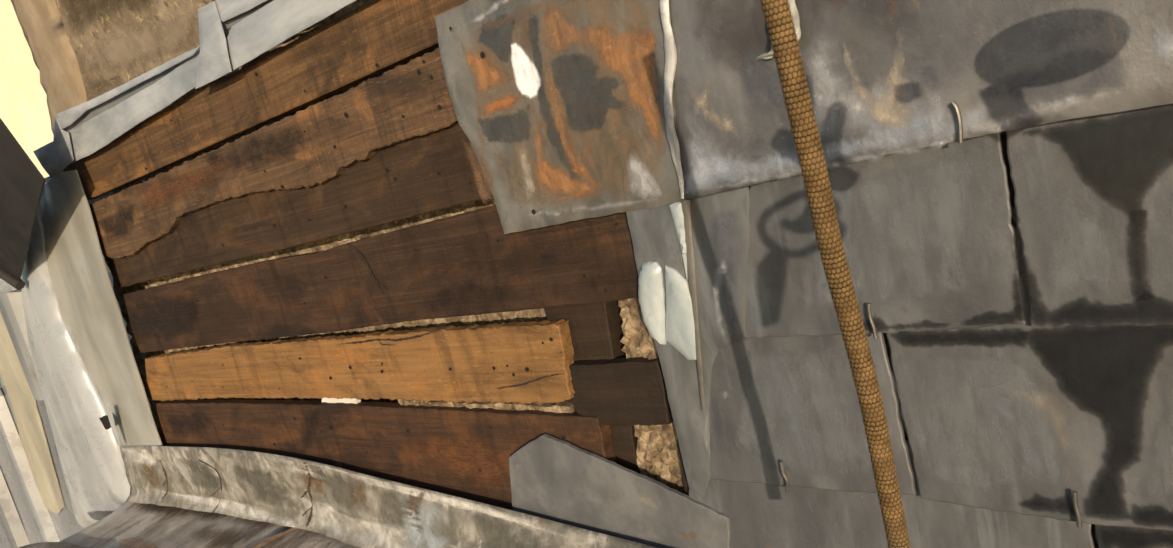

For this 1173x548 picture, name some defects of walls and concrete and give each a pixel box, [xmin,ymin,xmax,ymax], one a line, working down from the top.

corrosion [467,0,659,199]
water stain [803,221,834,305]
water stain [832,160,989,301]
water stain [863,107,1173,548]
water stain [738,351,872,472]